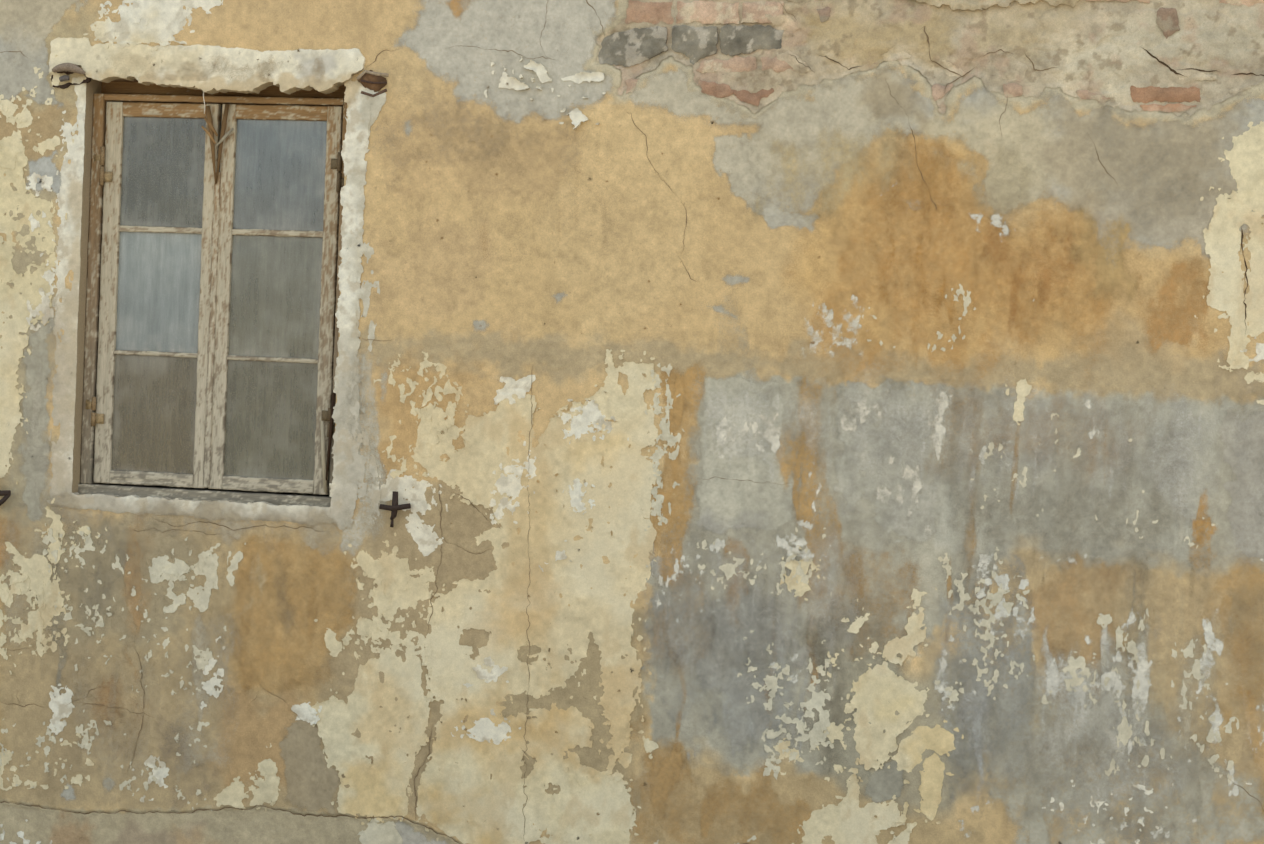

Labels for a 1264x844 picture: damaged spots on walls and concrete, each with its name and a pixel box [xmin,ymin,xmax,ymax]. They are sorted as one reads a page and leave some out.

spalling [348,70,389,141]
spalling [484,0,1264,130]
peeling [0,0,223,484]
peeling [1200,121,1264,384]
peeling [0,498,280,812]
crack [0,731,458,843]
peeling [291,349,685,844]
peeling [694,373,832,601]
peeling [737,547,1035,844]
damp [630,368,1264,844]
peeling [1041,651,1174,786]
peeling [1171,638,1239,783]